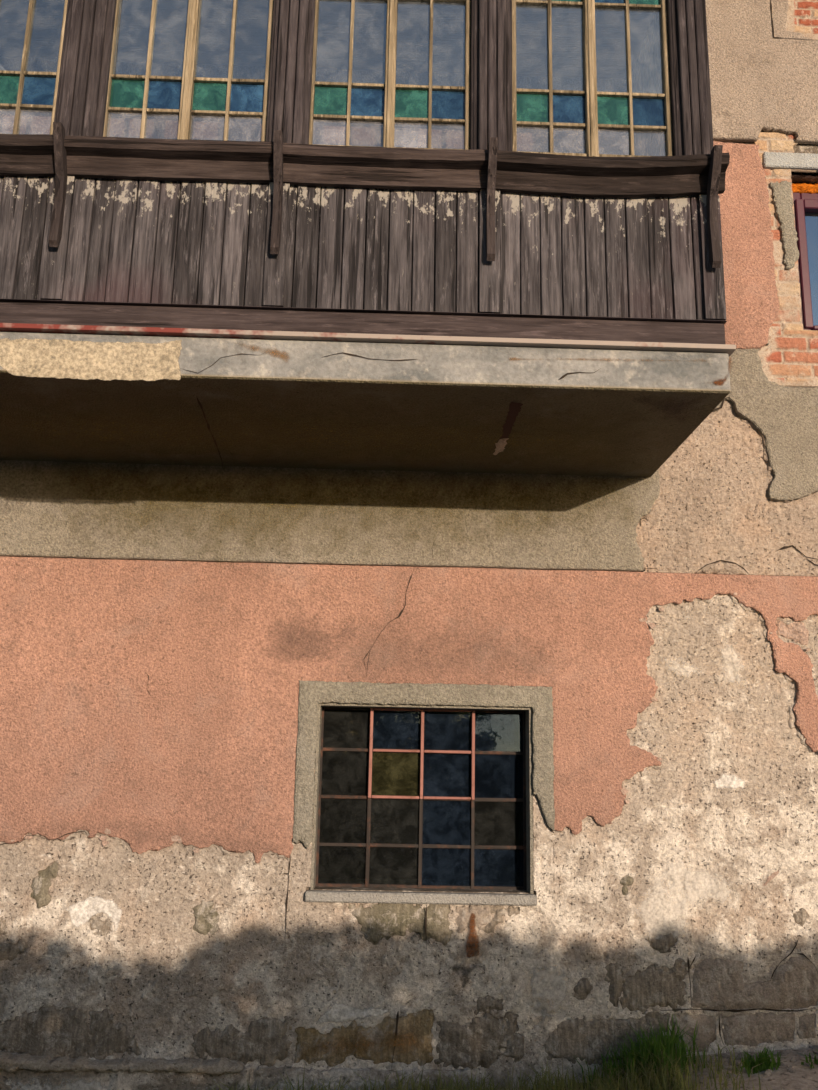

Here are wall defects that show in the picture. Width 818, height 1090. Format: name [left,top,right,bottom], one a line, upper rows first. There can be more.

flaking render [786,0,818,40]
flaking render [754,132,818,388]
spalling [0,338,182,381]
crack [324,352,416,361]
crack [364,538,436,677]
flaking render [636,400,818,576]
crack [776,545,818,566]
flaking render [0,592,818,1090]